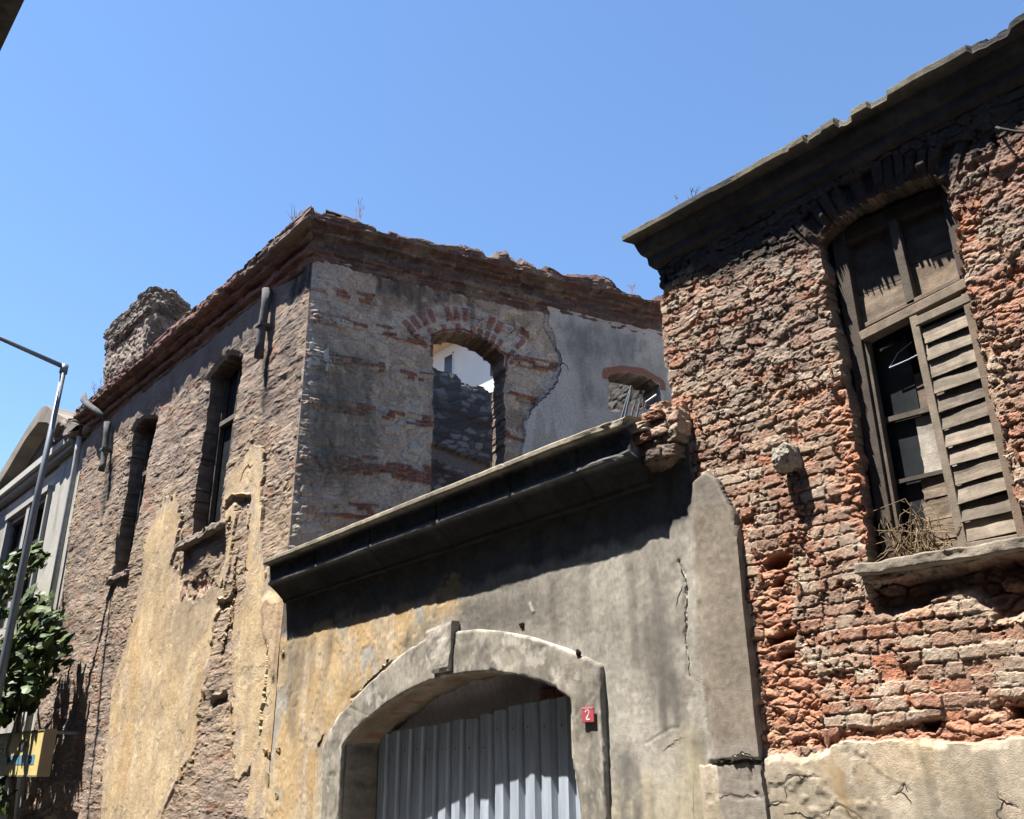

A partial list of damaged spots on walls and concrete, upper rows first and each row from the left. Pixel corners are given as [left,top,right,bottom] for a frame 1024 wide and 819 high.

spalling [954,201,1024,459]
spalling [630,400,693,473]
spalling [821,366,868,560]
flaking render [98,445,284,819]
crack [676,562,690,677]
spalling [746,547,1024,755]
crack [663,737,851,819]